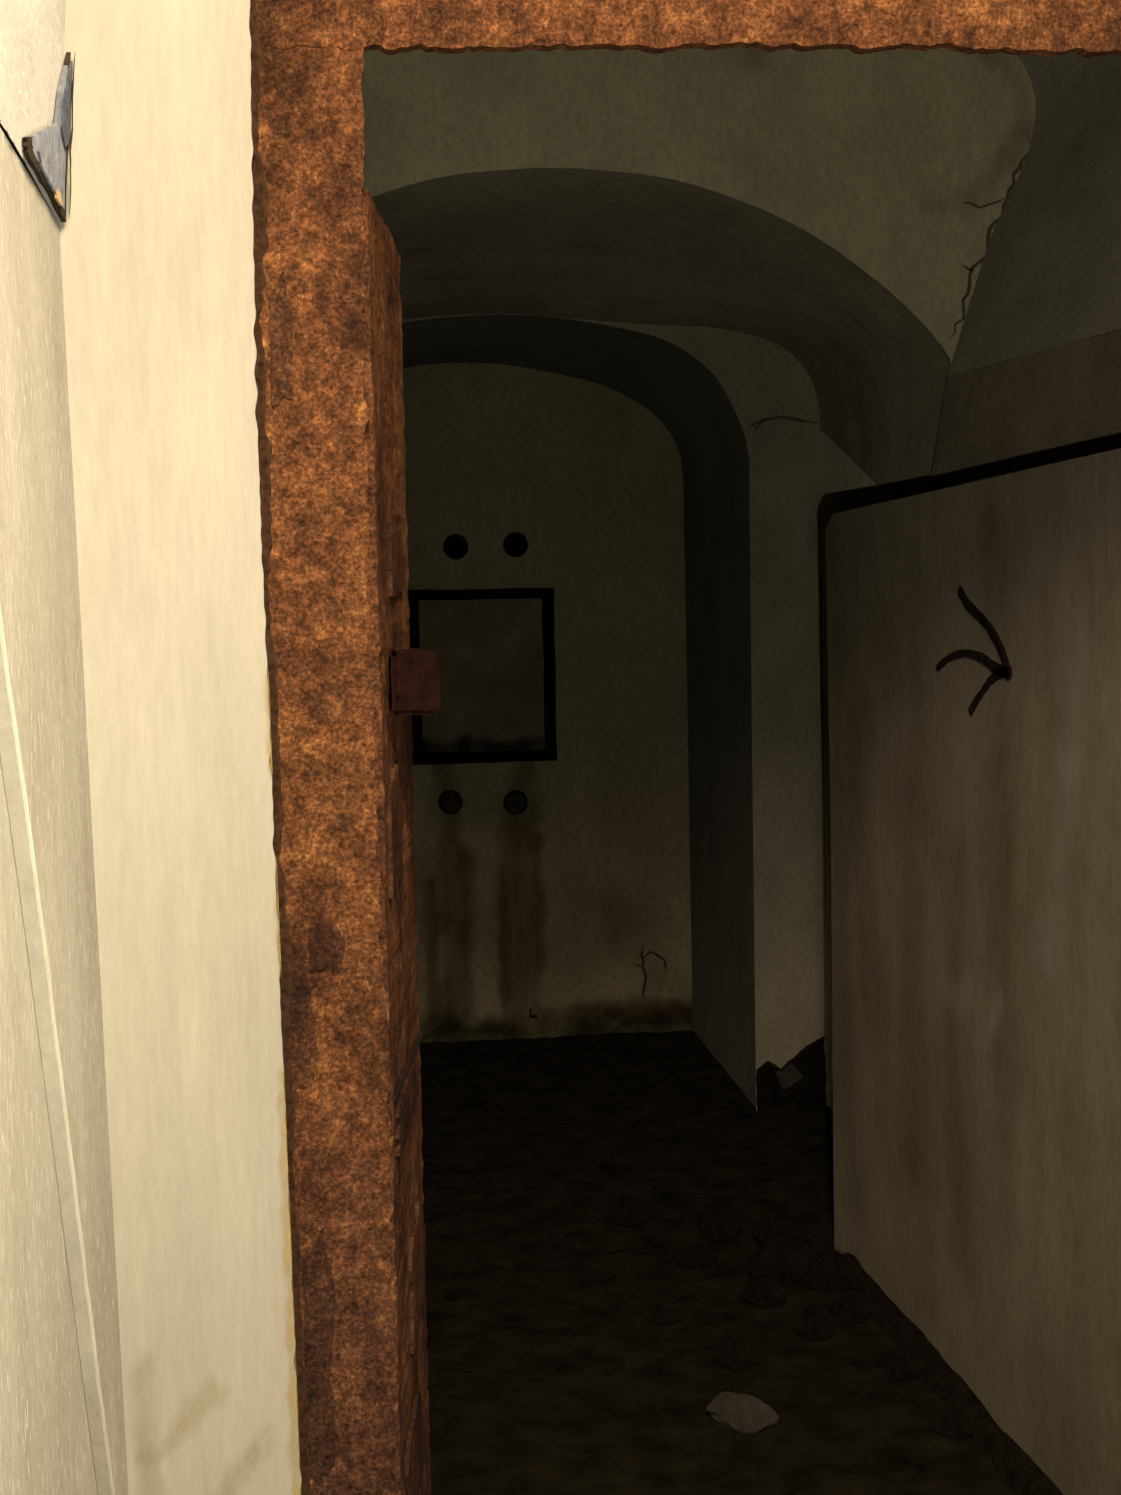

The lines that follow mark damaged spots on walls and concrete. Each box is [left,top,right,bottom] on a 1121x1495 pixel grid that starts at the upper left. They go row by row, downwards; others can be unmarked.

flaking render [22,52,75,222]
crack [947,136,1031,339]
corrosion [249,0,310,1495]